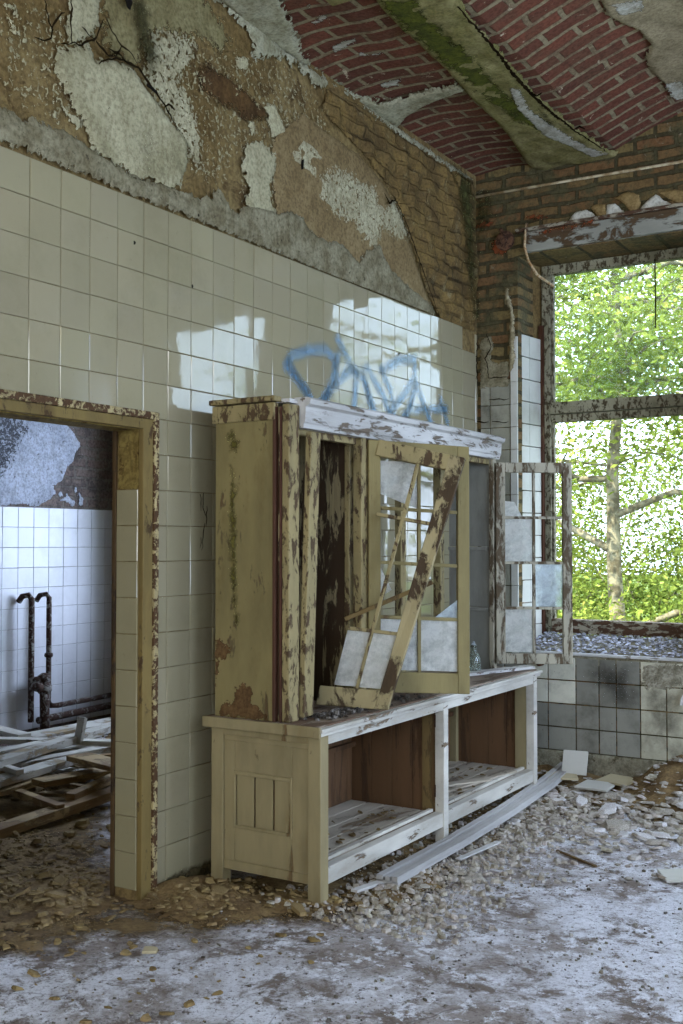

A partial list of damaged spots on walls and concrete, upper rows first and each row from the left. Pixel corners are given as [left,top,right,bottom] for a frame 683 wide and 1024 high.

crack [35,0,179,130]
crack [457,6,605,151]
peeling [510,88,608,157]
flaking render [0,0,516,390]
flaking render [570,189,683,220]
flaking render [0,417,83,507]